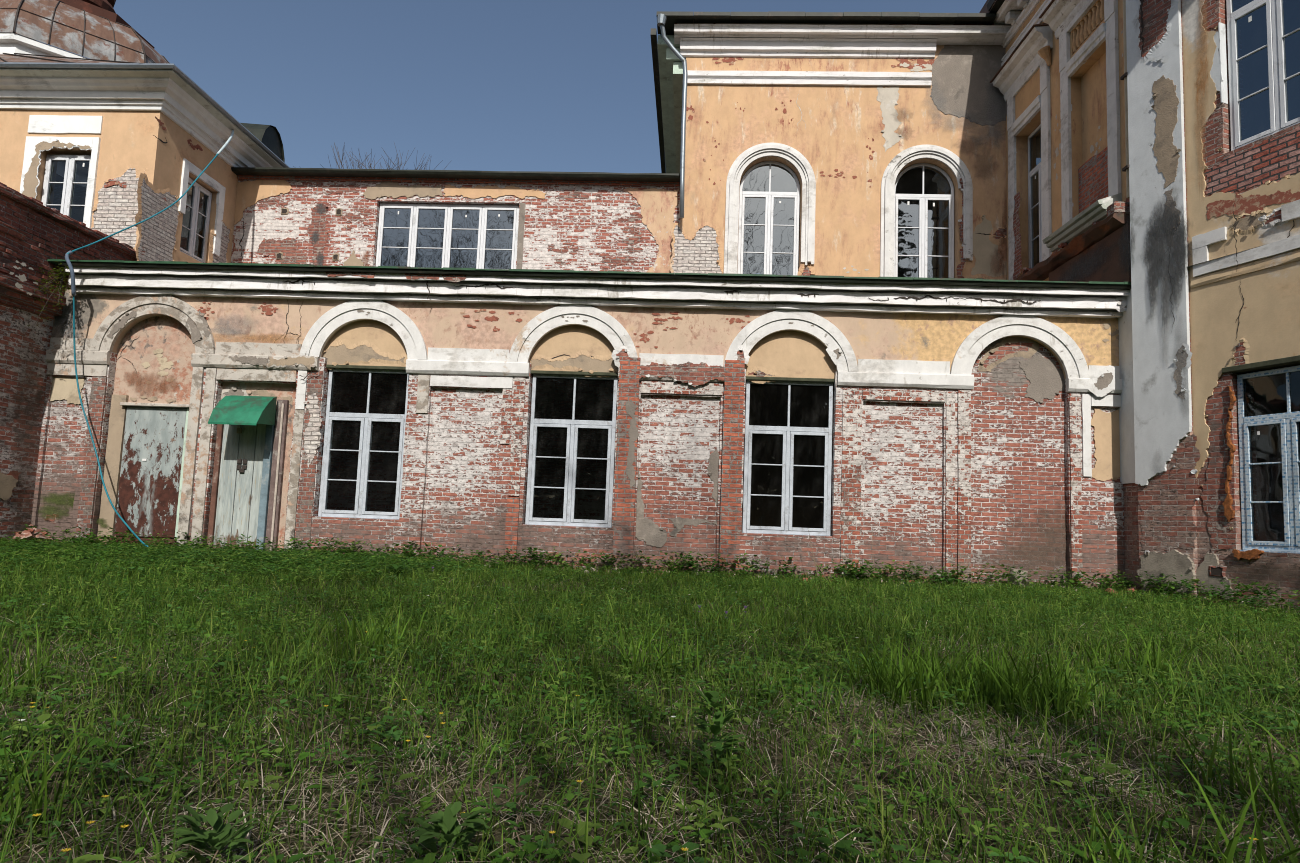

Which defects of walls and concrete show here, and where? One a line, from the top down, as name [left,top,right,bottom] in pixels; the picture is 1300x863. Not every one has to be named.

flaking render [91,164,181,261]
peeling [208,180,292,263]
peeling [257,182,603,266]
flaking render [591,187,724,275]
water stain [1062,199,1193,324]
flaking render [1201,109,1300,238]
peeling [978,337,1065,403]
peeling [1086,365,1120,482]
peeling [0,470,20,500]
peeling [625,399,719,548]